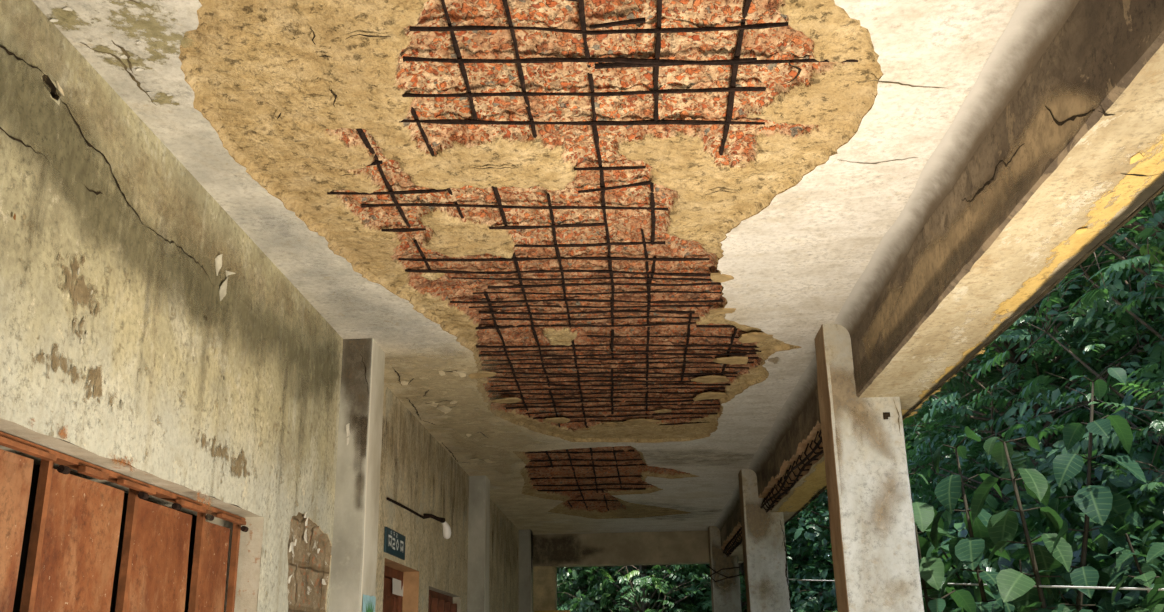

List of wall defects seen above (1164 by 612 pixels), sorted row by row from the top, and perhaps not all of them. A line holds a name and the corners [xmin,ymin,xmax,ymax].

spalling [42,74,64,101]
crack [0,41,214,286]
crack [963,143,1025,202]
crack [1045,106,1111,126]
leakage [0,52,372,449]
spalling [50,0,883,519]
peeling [883,134,1164,420]
spalling [287,512,332,612]
spalling [721,521,742,557]